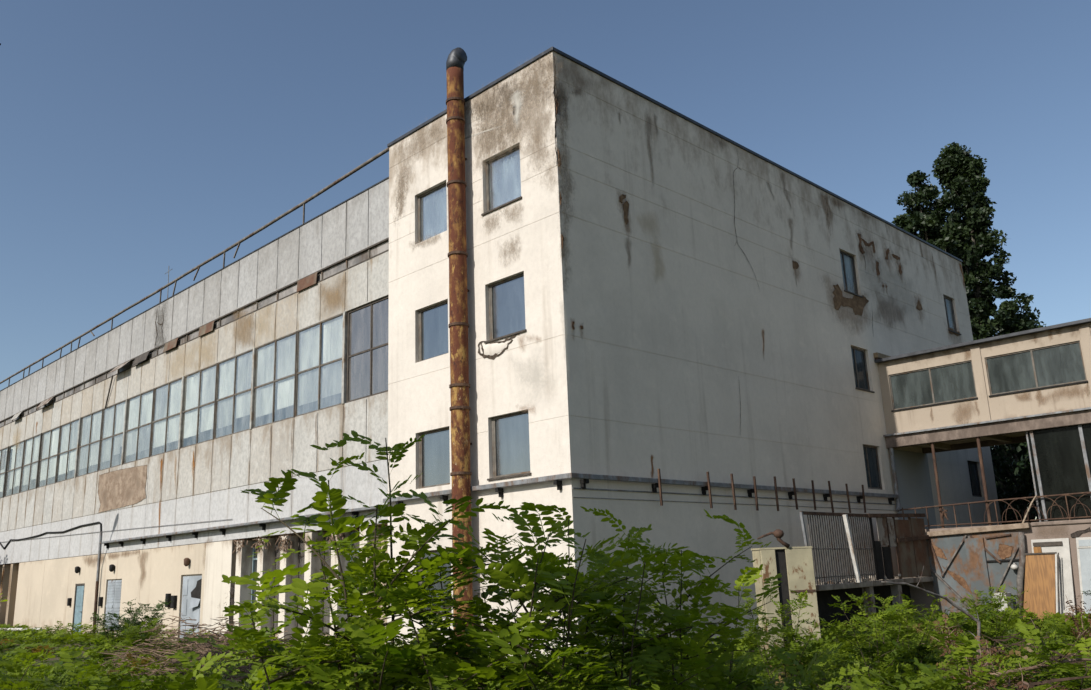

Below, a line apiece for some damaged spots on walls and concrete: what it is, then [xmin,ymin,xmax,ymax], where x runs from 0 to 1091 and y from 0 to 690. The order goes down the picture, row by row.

peeling [857,233,902,288]
spalling [833,284,869,316]
rust [932,544,972,594]